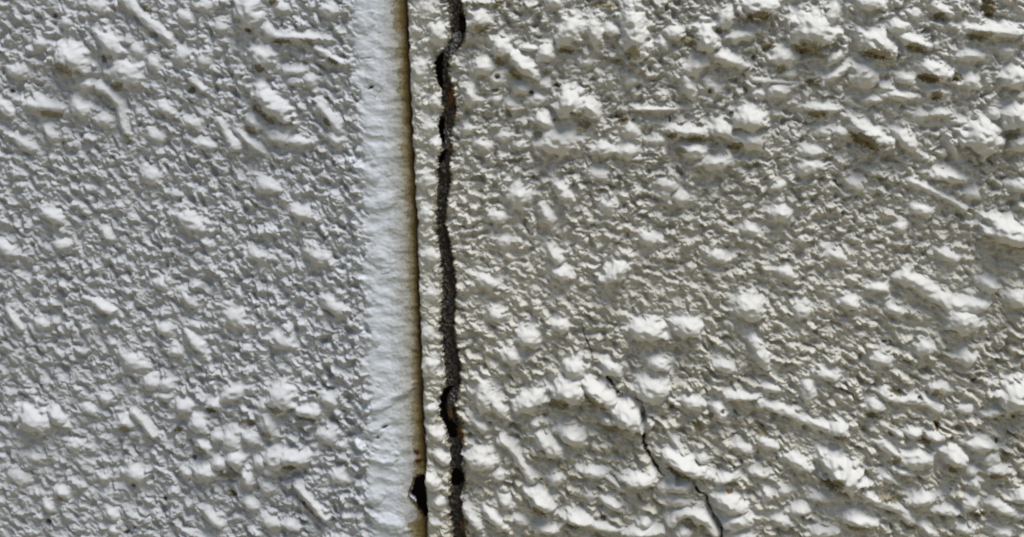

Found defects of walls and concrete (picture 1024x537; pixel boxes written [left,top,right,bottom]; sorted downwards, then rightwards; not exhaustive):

crack [434,0,466,537]
crack [581,322,723,537]